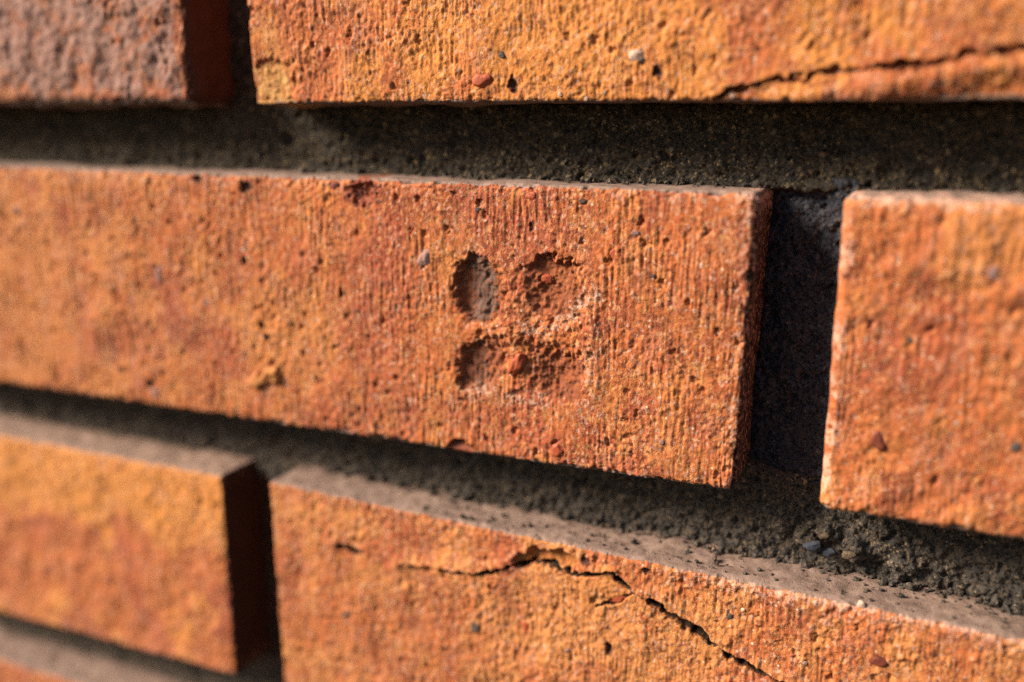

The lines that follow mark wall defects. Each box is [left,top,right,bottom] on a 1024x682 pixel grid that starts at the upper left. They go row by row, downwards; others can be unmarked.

crack [713,43,1024,103]
spalling [452,253,505,322]
spalling [526,253,588,319]
spalling [457,336,506,392]
spalling [534,349,584,403]
crack [400,545,783,682]